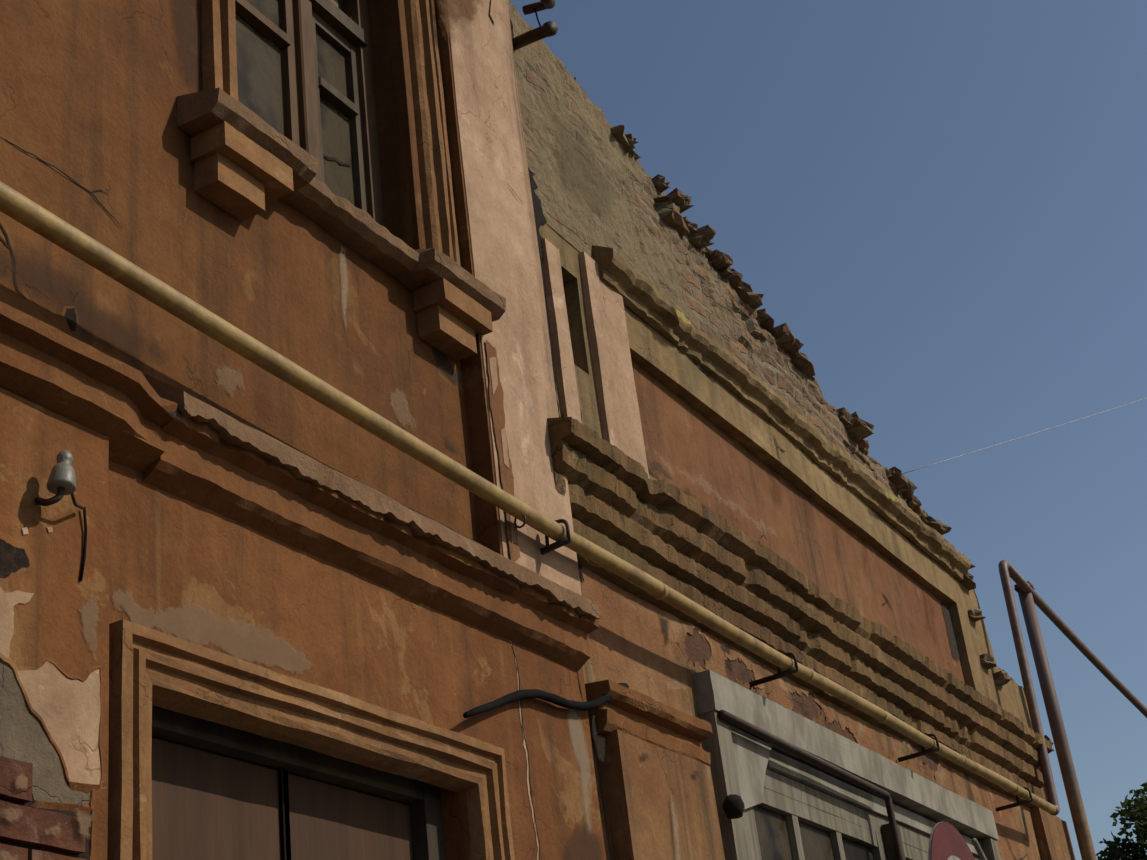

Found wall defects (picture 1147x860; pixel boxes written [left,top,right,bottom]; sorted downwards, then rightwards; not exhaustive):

crack [1,135,122,228]
crack [0,223,25,297]
peeling [0,527,103,860]